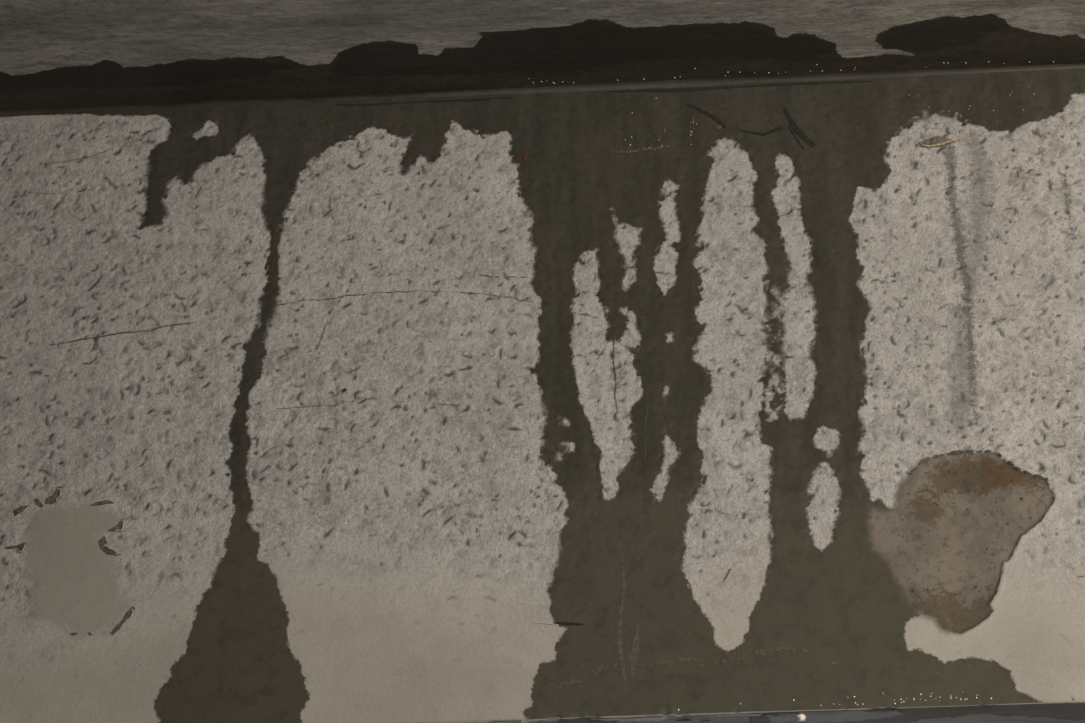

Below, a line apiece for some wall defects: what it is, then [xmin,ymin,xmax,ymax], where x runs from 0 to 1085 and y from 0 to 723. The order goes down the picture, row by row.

crack [336,96,513,106]
leakage [0,14,1085,110]
crack [608,80,871,92]
leakage [63,108,242,229]
leakage [154,68,1085,723]